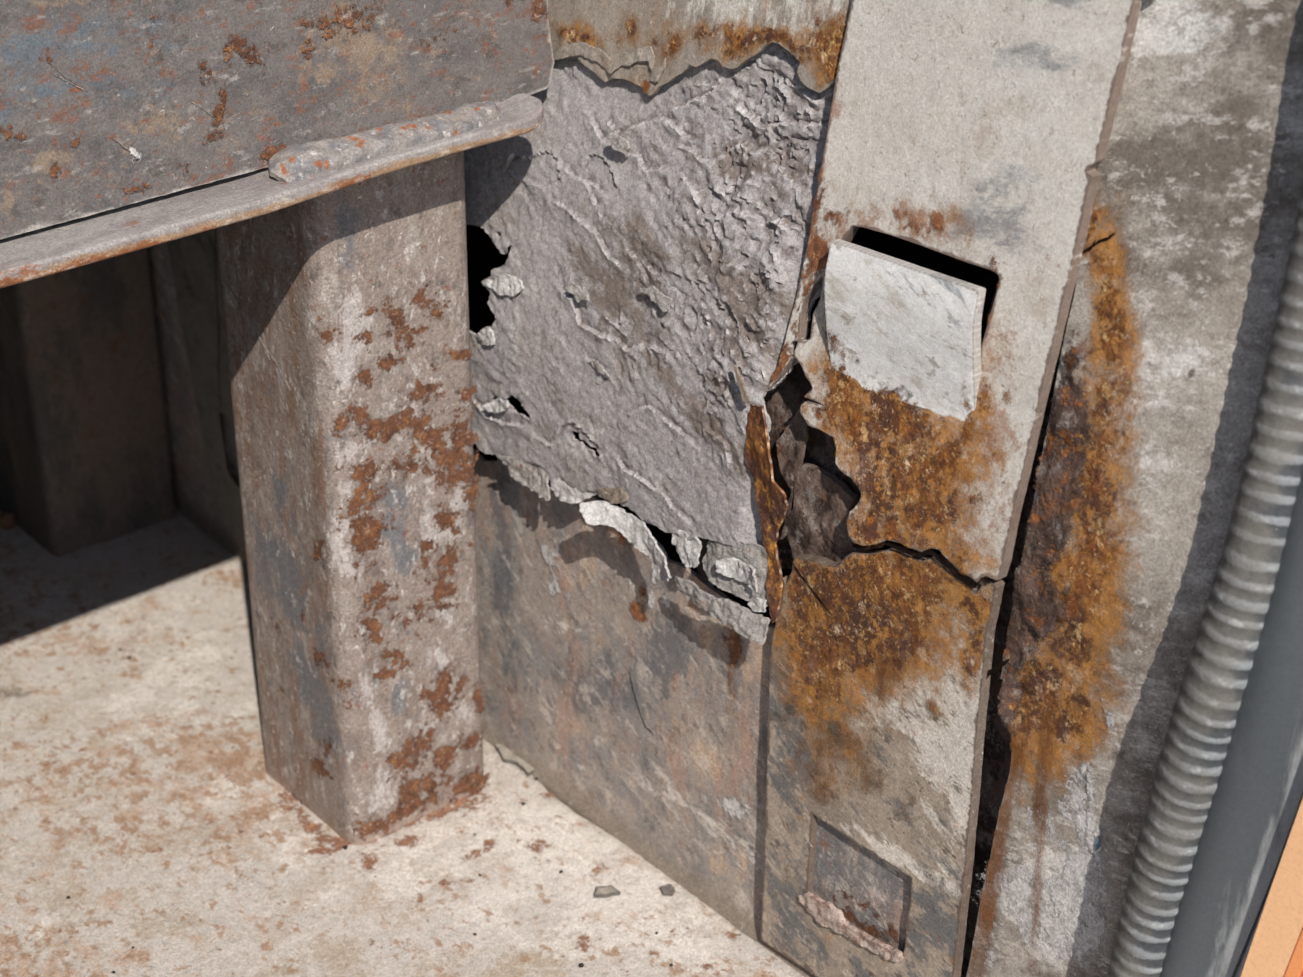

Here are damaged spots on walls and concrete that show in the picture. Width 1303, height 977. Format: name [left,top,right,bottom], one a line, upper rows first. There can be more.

rust [198,33,271,151]
rust [295,0,386,59]
rust [487,0,636,49]
rust [652,9,847,86]
rust [250,143,291,165]
peeling [464,42,835,645]
rust [317,280,482,683]
rust [770,158,1010,804]
crack [852,541,990,588]
rust [973,208,1143,962]
crack [986,659,1010,679]
rust [278,663,498,872]